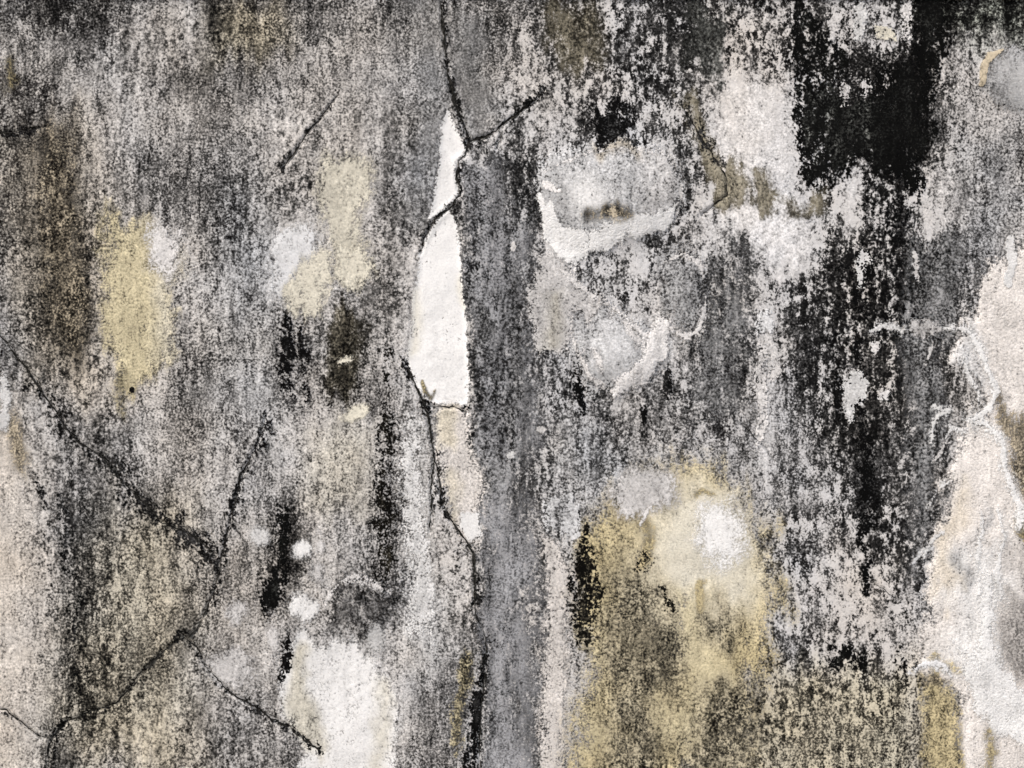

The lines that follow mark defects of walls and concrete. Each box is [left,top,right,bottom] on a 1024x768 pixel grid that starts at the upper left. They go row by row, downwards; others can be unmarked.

crack [277,101,333,173]
crack [416,0,550,259]
crack [0,335,324,762]
spalling [397,110,485,645]
crack [399,356,489,768]
water stain [606,466,681,526]
water stain [663,370,673,399]
water stain [681,0,1024,768]